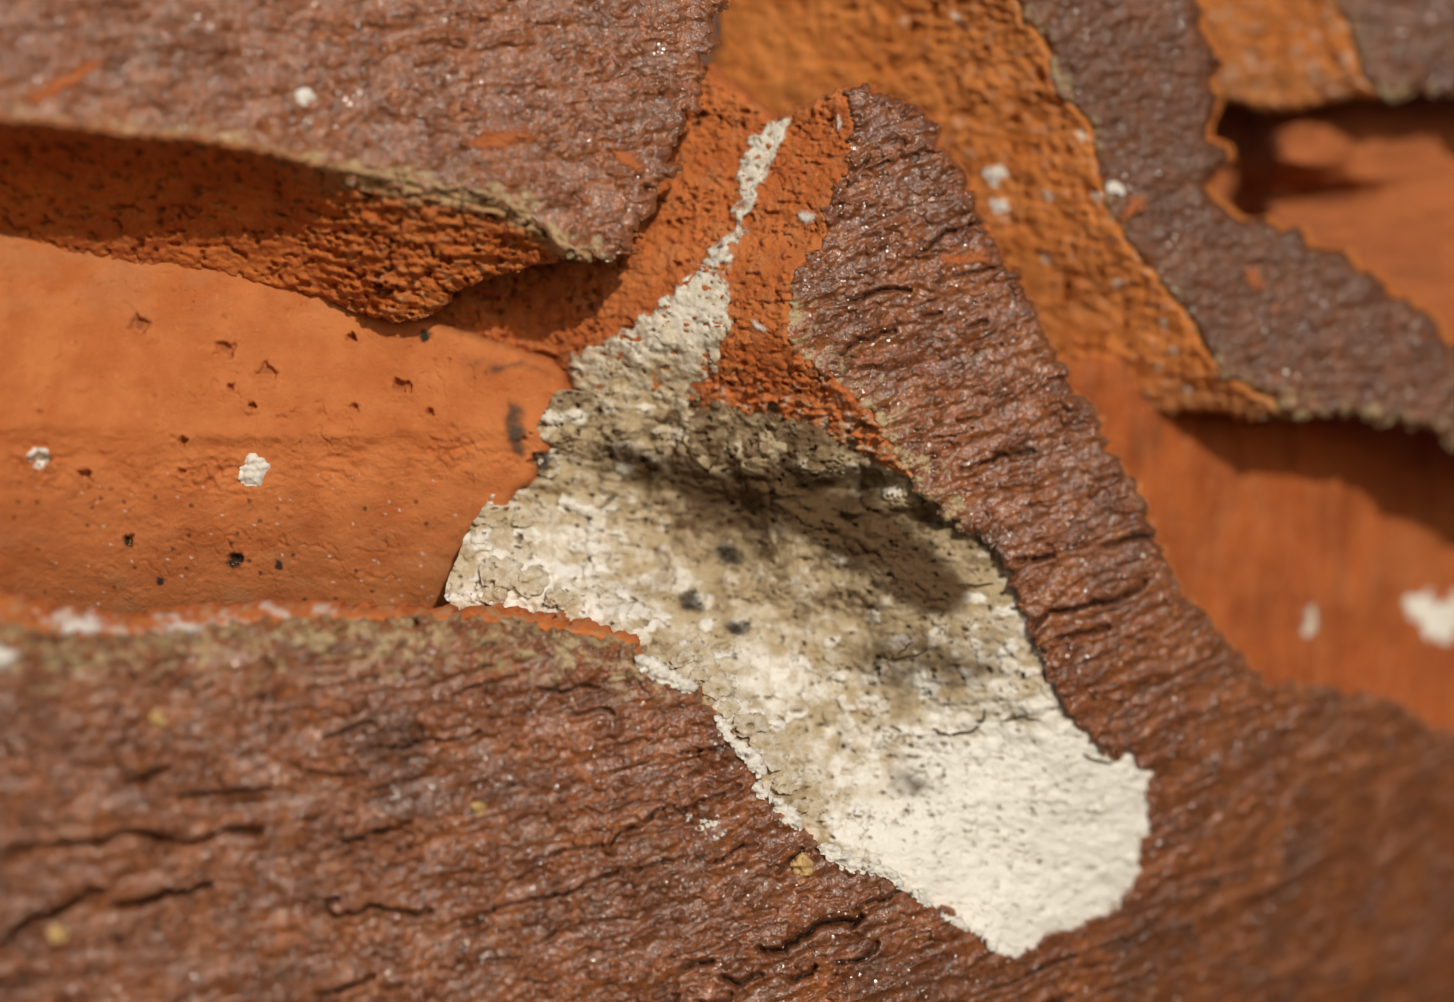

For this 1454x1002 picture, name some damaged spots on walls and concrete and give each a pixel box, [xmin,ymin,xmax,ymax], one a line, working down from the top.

spalling [709,0,1454,452]
spalling [0,63,913,615]
spalling [444,118,1153,958]
spalling [1060,358,1454,736]
spalling [0,647,18,668]
spalling [0,590,643,655]
crack [875,642,928,661]
crack [321,976,401,995]
crack [325,898,432,916]
crack [475,786,737,961]
crack [675,892,897,1002]